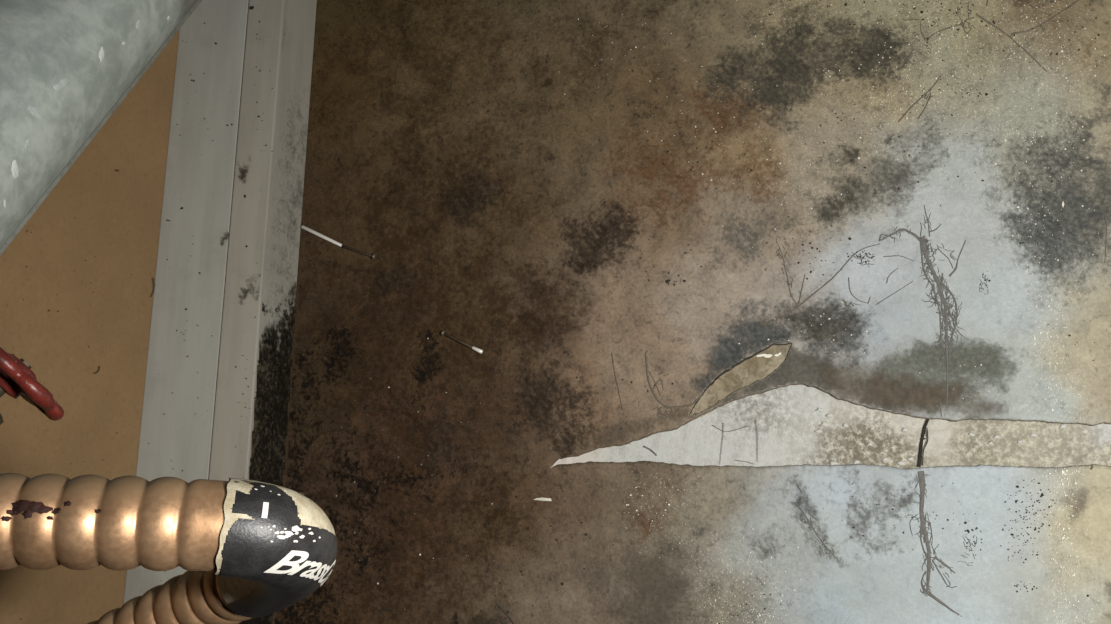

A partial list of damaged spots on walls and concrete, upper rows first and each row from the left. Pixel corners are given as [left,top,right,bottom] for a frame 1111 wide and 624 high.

leakage [708,0,1085,123]
leakage [729,104,946,285]
leakage [1008,118,1111,268]
leakage [546,201,655,296]
leakage [238,189,603,624]
peeling [551,383,1111,470]
leakage [696,304,1015,411]
crack [917,419,929,467]
leakage [1002,479,1056,563]